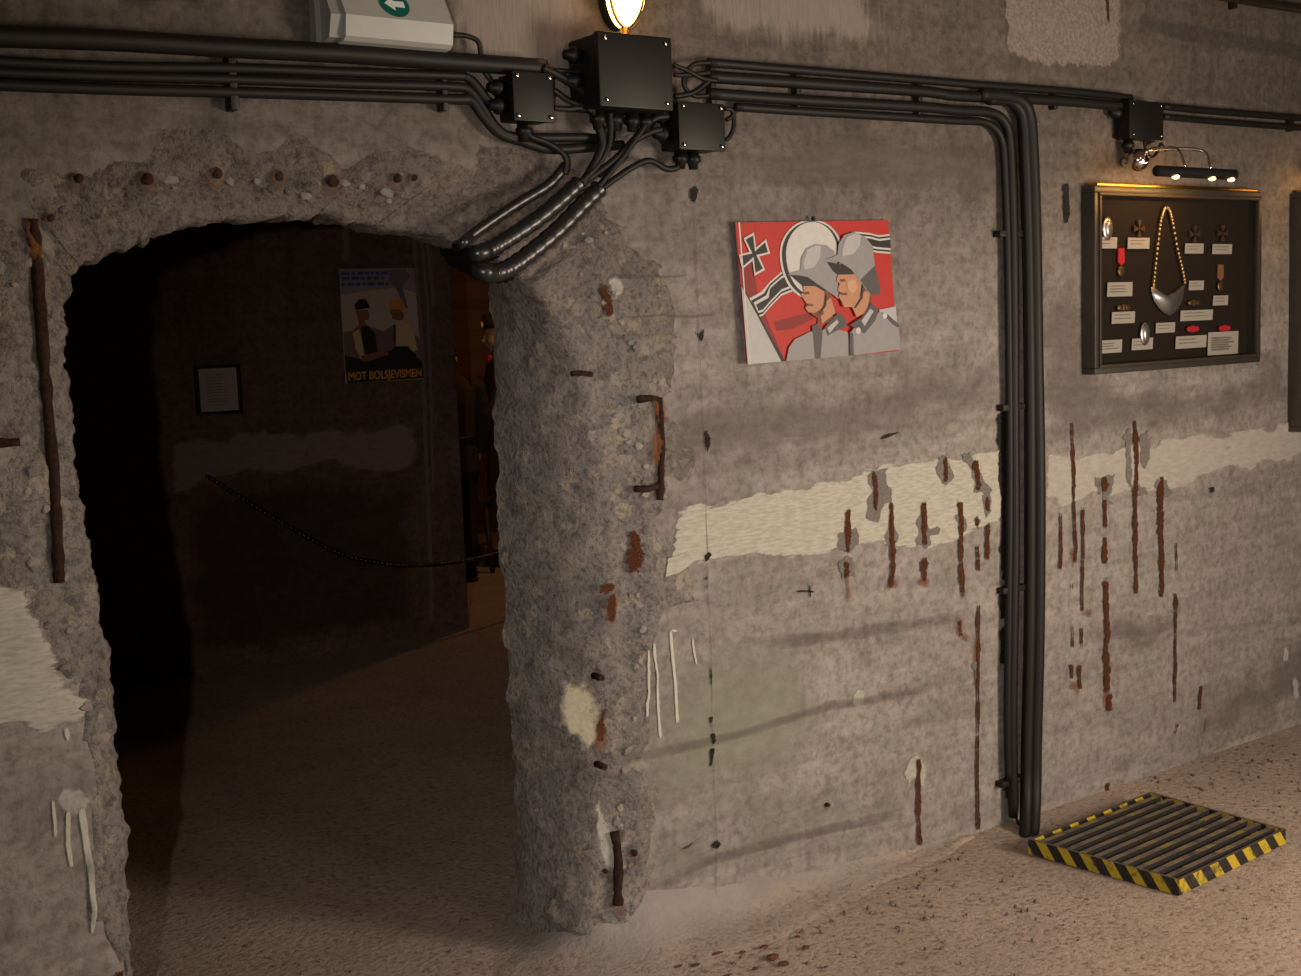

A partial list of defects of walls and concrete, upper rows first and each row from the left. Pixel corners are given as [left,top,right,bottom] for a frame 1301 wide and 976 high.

spalling [608,134,644,159]
corrosion [27,219,65,583]
spalling [0,126,590,976]
corrosion [634,395,665,500]
spalling [488,200,1002,936]
corrosion [837,468,899,598]
corrosion [915,502,940,586]
corrosion [936,453,992,596]
corrosion [1059,420,1178,711]
peeling [1046,423,1301,507]
damp [646,629,795,786]
damp [52,801,97,933]